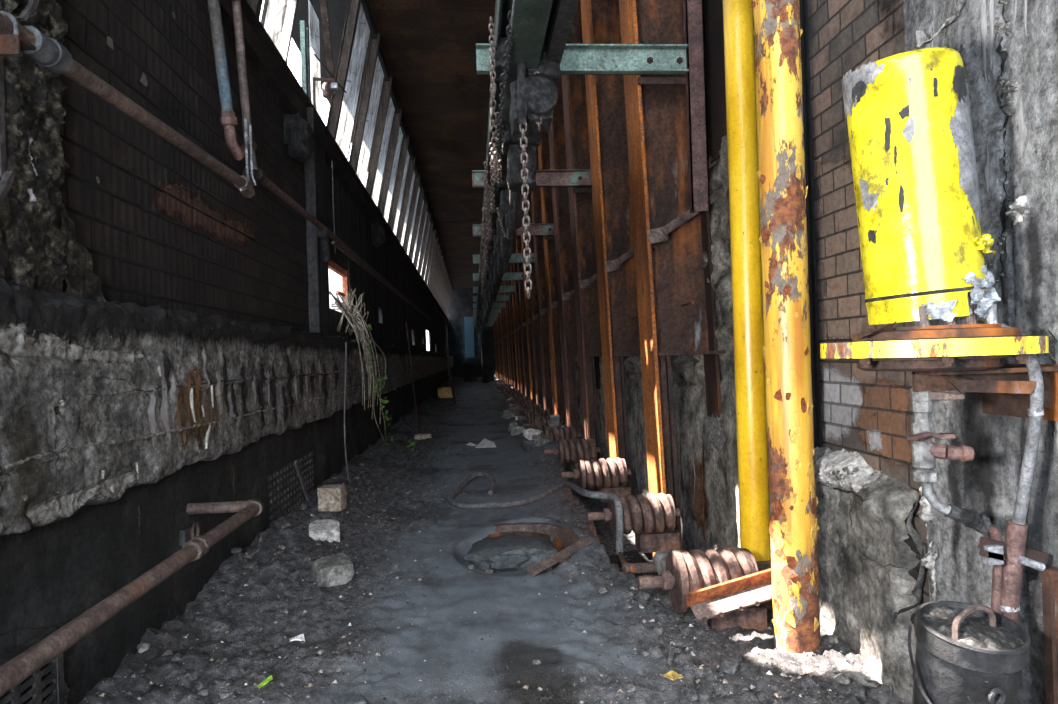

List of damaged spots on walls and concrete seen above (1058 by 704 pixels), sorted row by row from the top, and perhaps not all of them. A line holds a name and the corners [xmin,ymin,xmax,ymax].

peeling [842,61,885,118]
peeling [902,117,915,143]
peeling [949,83,982,221]
crack [988,0,1011,288]
peeling [974,234,996,254]
spalling [0,323,154,371]
rust [175,366,225,449]
crack [0,465,8,532]
spalling [24,471,147,525]
crack [820,482,921,624]